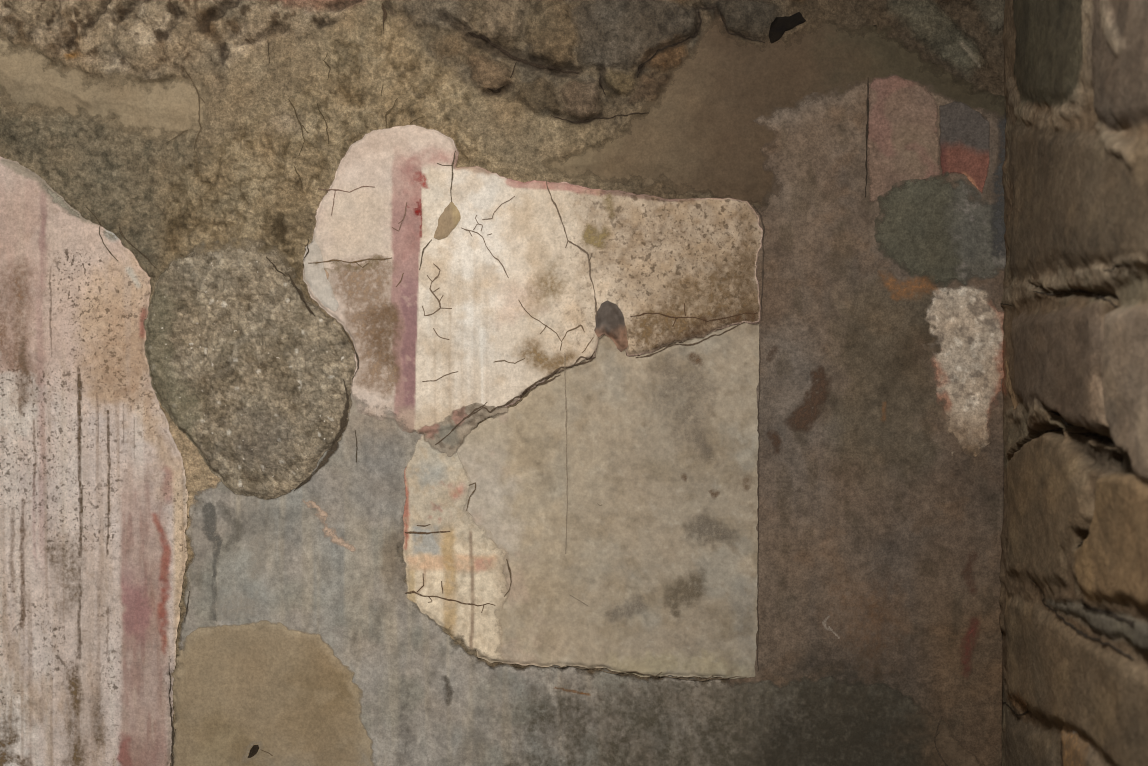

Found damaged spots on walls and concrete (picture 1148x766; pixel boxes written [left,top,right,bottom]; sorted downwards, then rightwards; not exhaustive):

crack [437,151,456,202]
flaking render [434,202,461,240]
flaking render [304,239,339,311]
crack [435,178,597,554]
flaking render [926,286,1019,457]
crack [551,205,765,681]
crack [405,482,476,534]
crack [406,559,512,613]